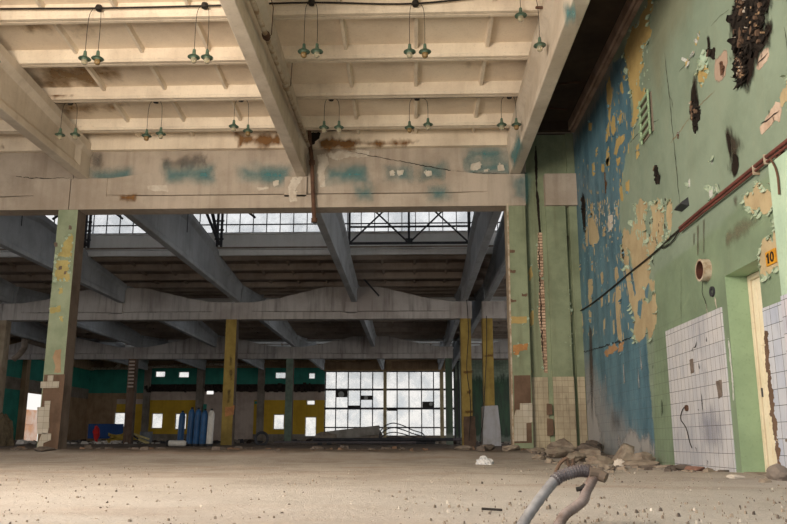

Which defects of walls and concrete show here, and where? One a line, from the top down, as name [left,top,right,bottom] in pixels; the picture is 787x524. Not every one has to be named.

flaking render [681,0,769,90]
crack [350,151,451,171]
peeling [564,0,673,358]
peeling [52,225,74,294]
peeling [739,179,779,282]
flaking render [37,349,65,449]
flaking render [514,375,531,415]
flaking render [514,422,532,443]